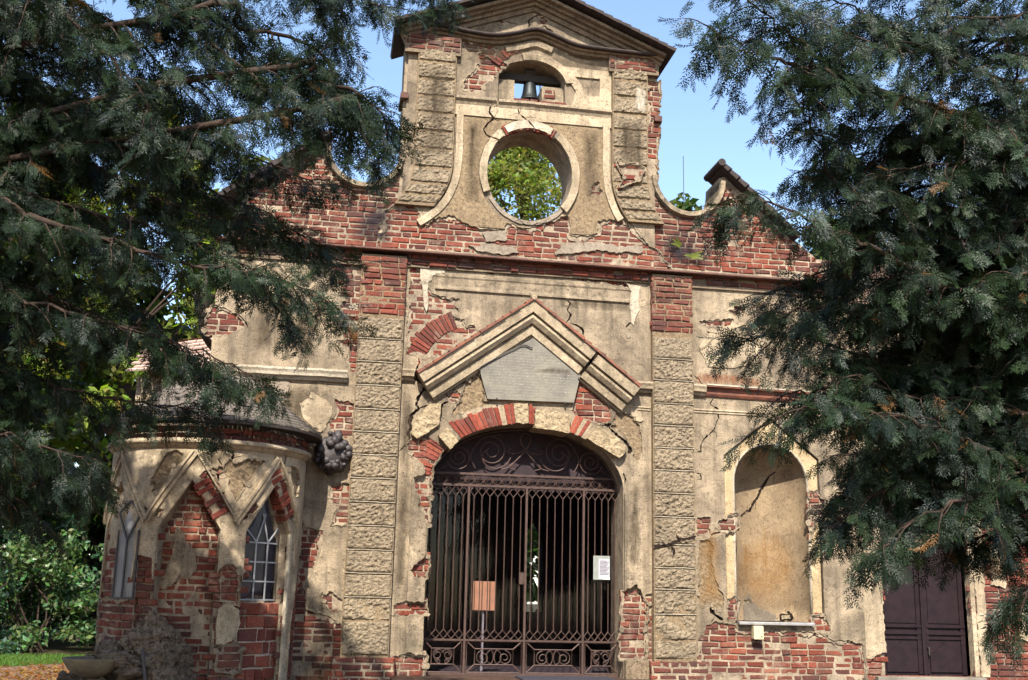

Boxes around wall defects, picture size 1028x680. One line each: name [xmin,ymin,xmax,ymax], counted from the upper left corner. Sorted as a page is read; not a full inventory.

flaking render [614,79,662,190]
flaking render [376,204,673,270]
flaking render [404,267,514,366]
crack [399,362,465,451]
flaking render [443,373,493,417]
crack [695,374,721,480]
flaking render [136,449,184,518]
flaking render [199,457,267,526]
crack [654,472,775,557]
flaking render [279,466,350,680]
flaking render [617,585,652,662]
flaking render [695,509,869,680]